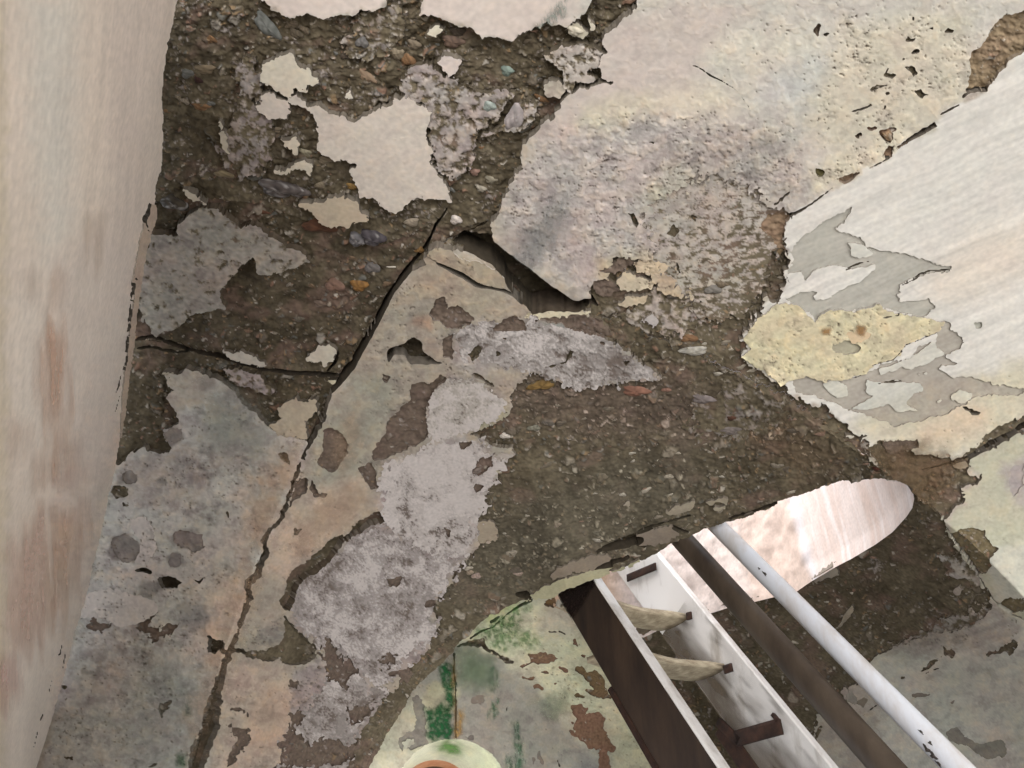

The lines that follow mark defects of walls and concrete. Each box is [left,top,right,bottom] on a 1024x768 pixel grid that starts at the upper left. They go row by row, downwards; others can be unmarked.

spalling [870,37,920,110]
spalling [967,10,1024,90]
spalling [855,126,908,158]
spalling [116,0,637,473]
spalling [157,576,182,589]
spalling [245,511,385,691]
crack [115,208,598,768]
damp [274,377,508,768]
crack [595,514,691,570]
spalling [273,169,1024,768]
crack [728,501,778,520]
spalling [226,707,251,767]